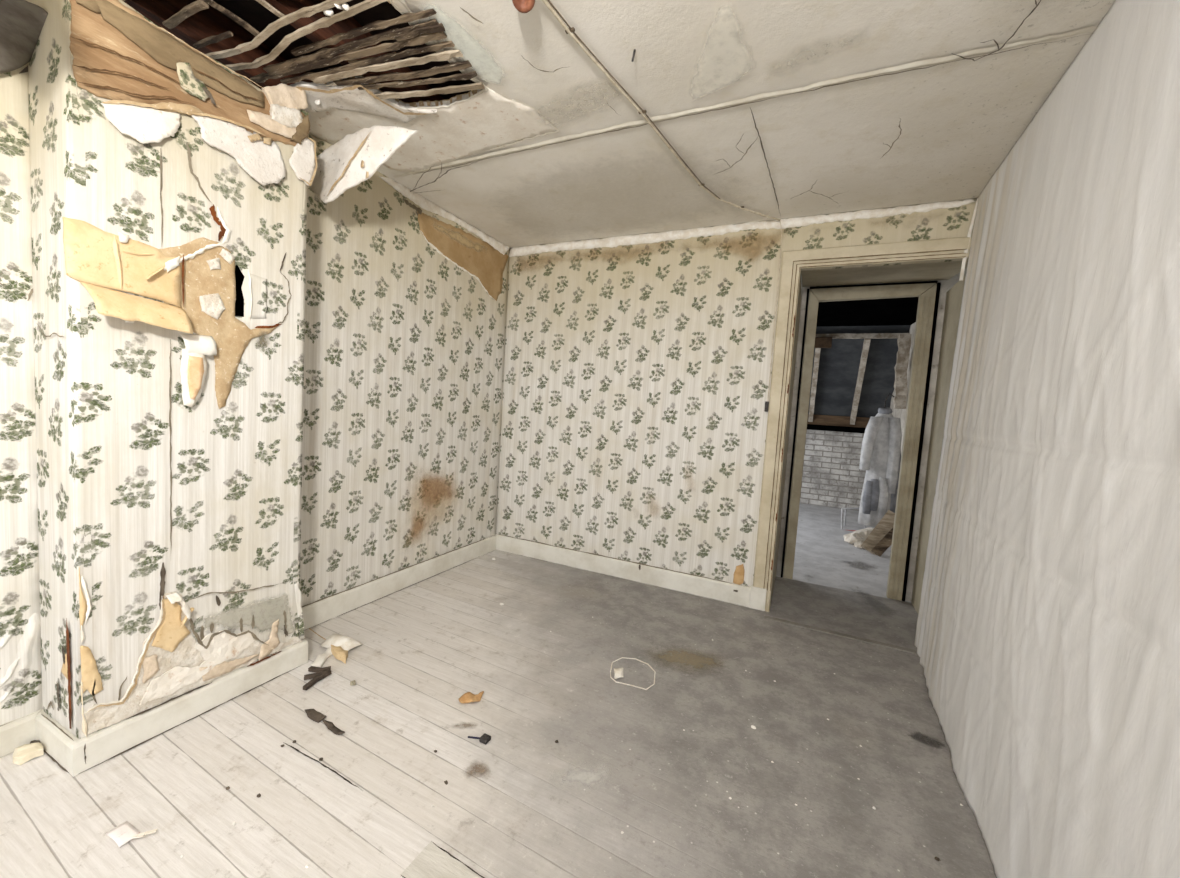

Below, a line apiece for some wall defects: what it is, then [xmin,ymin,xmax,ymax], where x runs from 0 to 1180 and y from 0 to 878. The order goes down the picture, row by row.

flaking render [101,75,482,186]
crack [410,0,1093,216]
spalling [235,265,244,317]
spalling [79,567,301,763]